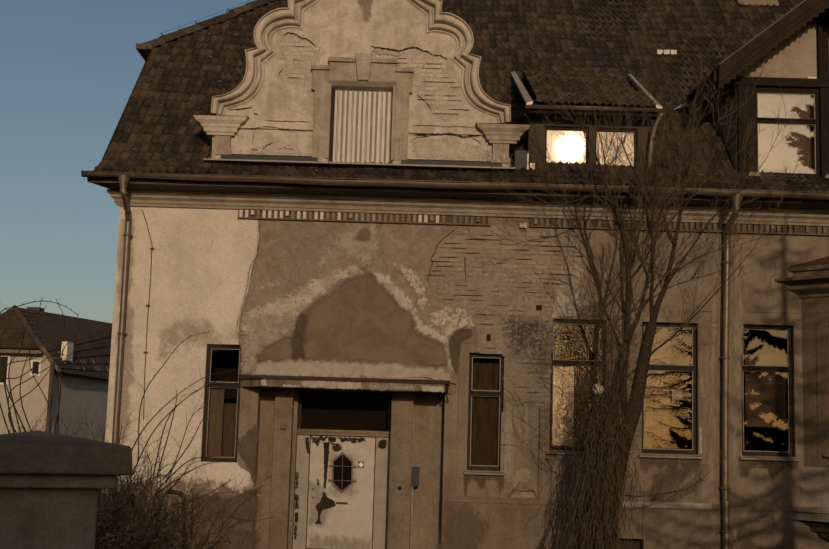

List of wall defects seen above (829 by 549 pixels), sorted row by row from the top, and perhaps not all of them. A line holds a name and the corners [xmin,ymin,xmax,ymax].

water stain [358,0,372,22]
flaking render [276,31,320,87]
flaking render [372,48,468,121]
flaking render [235,220,586,498]